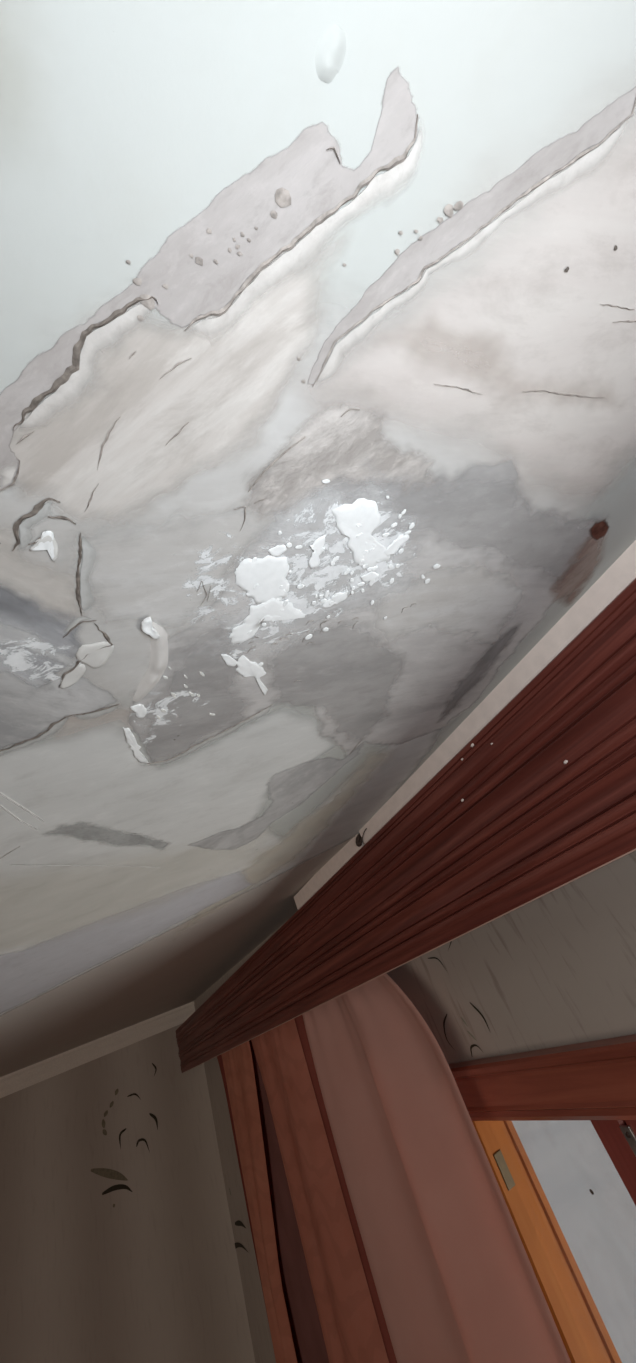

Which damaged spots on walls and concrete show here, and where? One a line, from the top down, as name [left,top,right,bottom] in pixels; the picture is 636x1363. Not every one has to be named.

peeling [0,67,636,850]
rust [554,520,609,603]
water stain [0,588,80,687]
water stain [444,627,517,716]
water stain [0,757,380,1013]